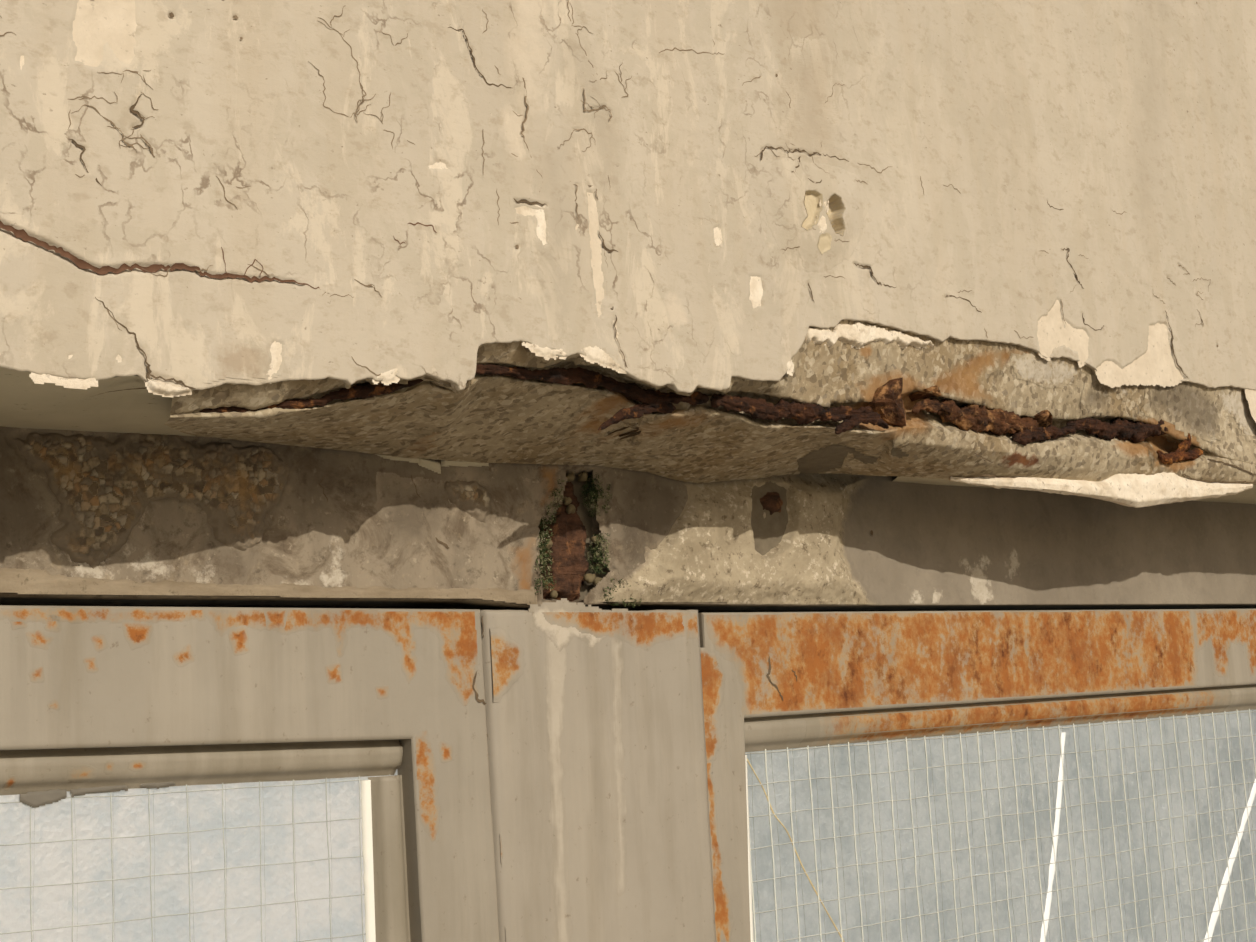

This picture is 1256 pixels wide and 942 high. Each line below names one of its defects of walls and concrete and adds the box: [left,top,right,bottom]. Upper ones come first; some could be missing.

crack [308,5,414,148]
crack [659,41,721,54]
crack [448,0,632,268]
crack [755,144,891,184]
crack [0,221,382,397]
crack [393,222,437,245]
crack [808,239,896,301]
rust [200,379,424,413]
spalling [144,192,1256,942]
rust [0,608,526,706]
rust [476,342,1256,942]
rust [415,729,453,843]